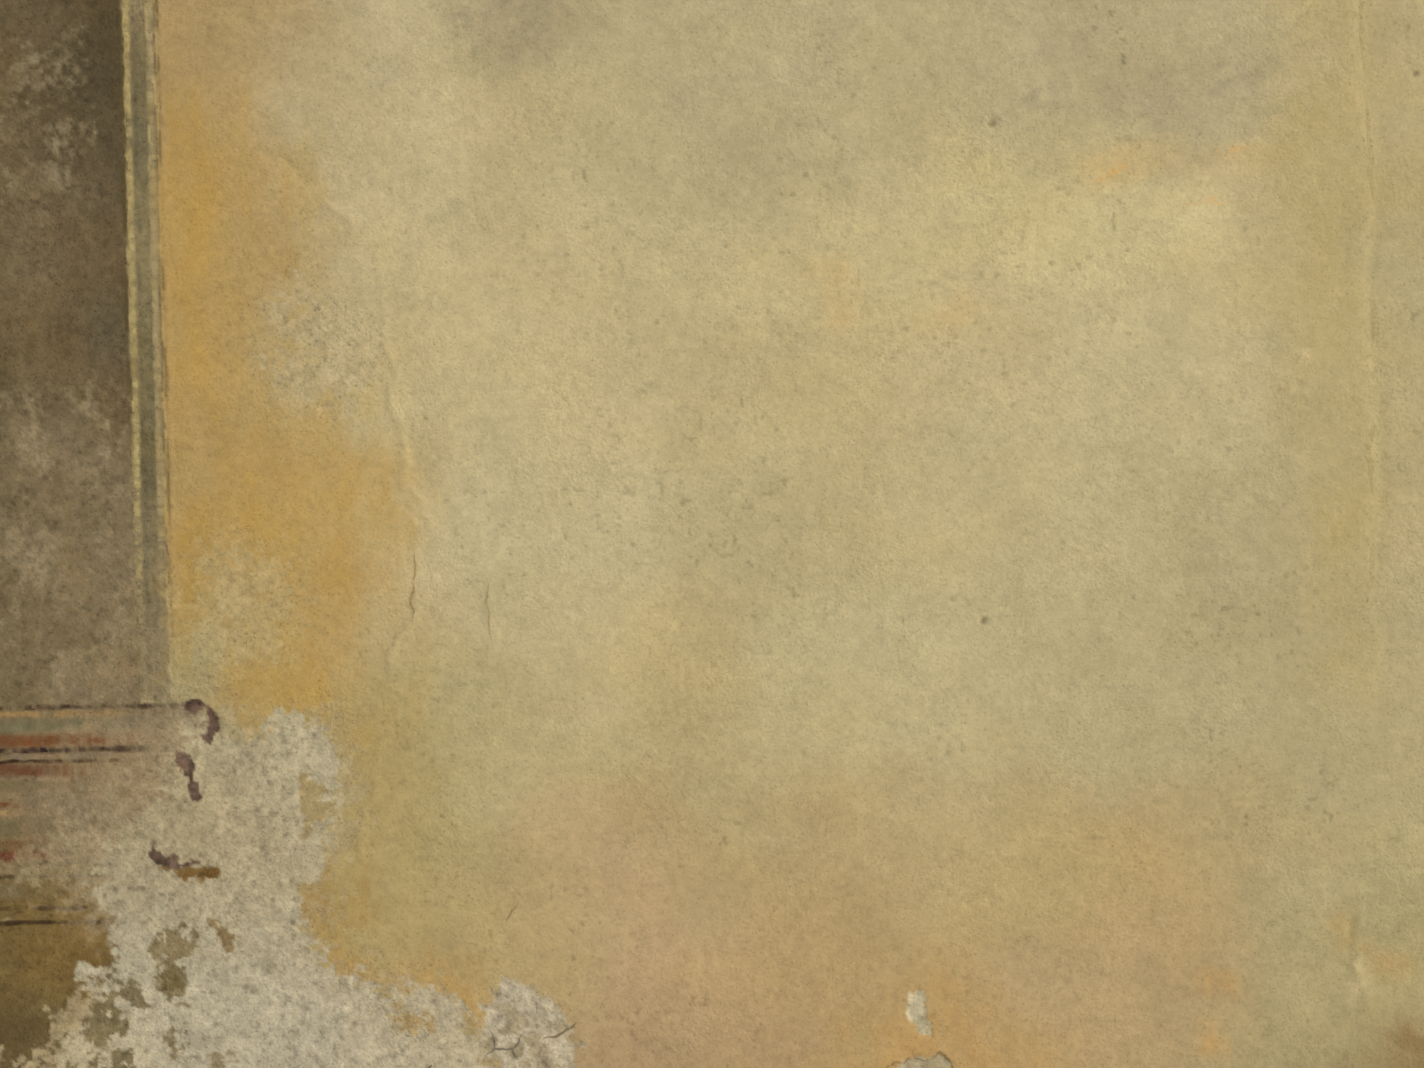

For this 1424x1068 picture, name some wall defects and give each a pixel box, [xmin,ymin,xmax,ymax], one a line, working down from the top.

peeling [0,674,499,1068]
spalling [885,988,958,1068]